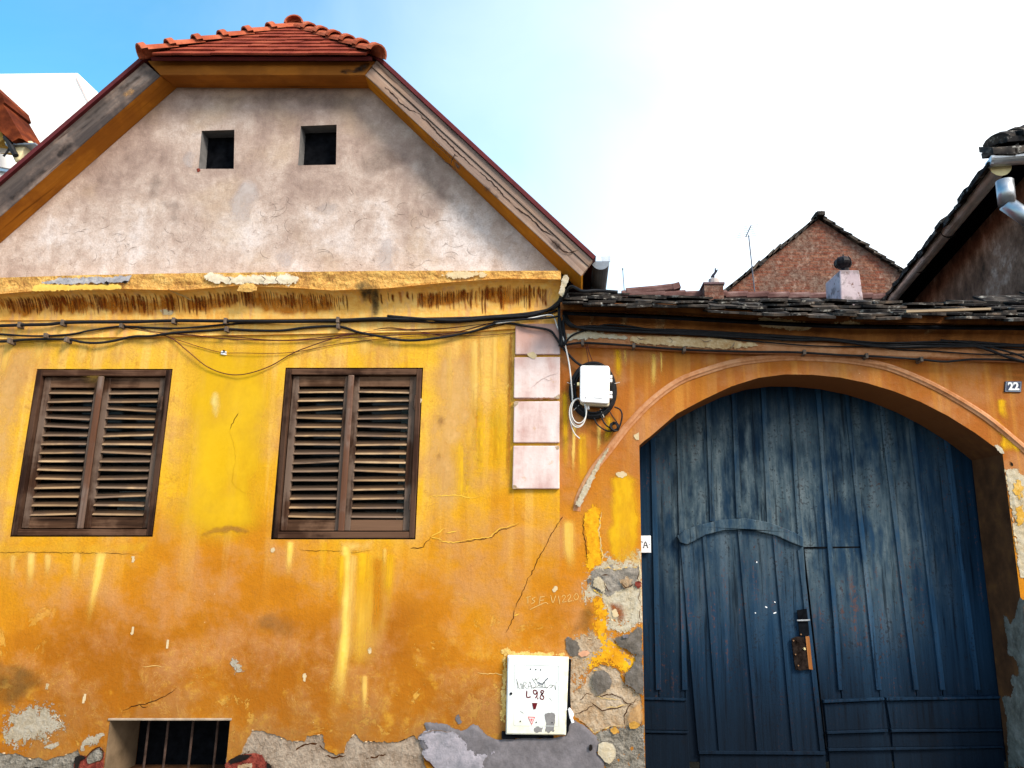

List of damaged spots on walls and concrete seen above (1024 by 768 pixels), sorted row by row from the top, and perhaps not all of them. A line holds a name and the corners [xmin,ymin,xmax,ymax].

corrosion [0,291,348,314]
peeling [566,330,758,350]
damp [338,544,393,681]
crack [413,522,519,549]
crack [506,517,563,632]
spalling [500,448,645,768]
peeling [995,437,1024,578]
peeling [0,683,105,768]
spalling [225,730,426,768]
spalling [1002,597,1024,768]